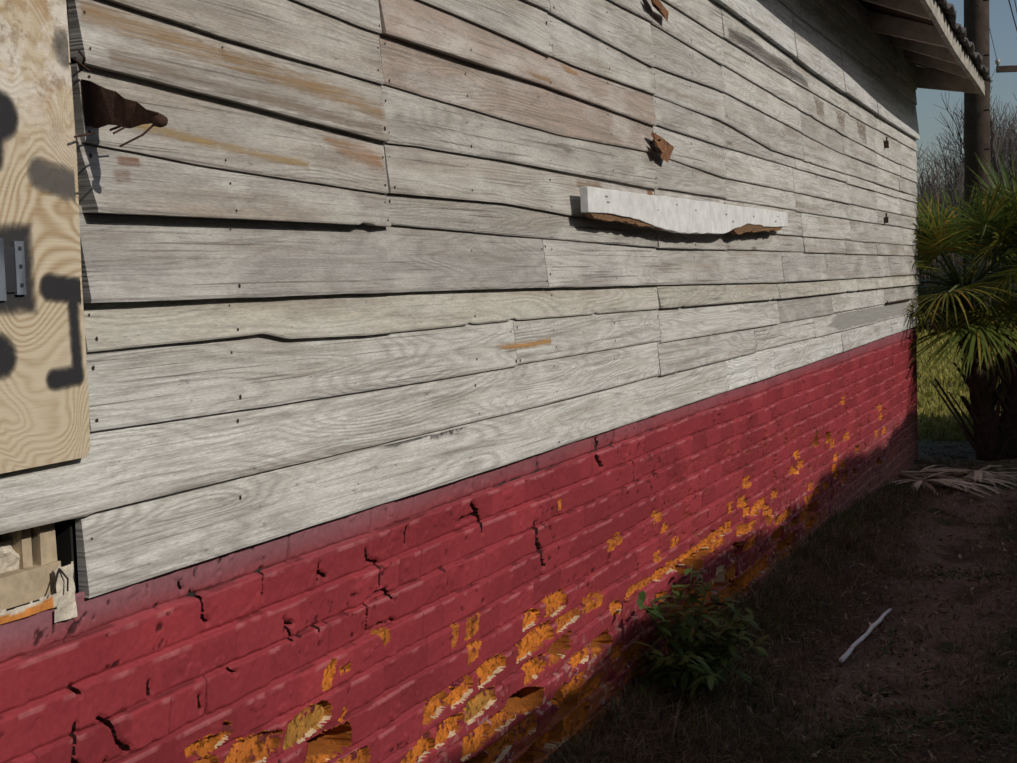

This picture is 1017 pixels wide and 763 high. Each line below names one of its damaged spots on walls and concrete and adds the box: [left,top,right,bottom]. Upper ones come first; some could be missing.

crack [457,501,483,533]
flaking render [0,539,20,574]
crack [532,520,546,568]
flaking render [0,561,77,624]
crack [177,581,208,622]
crack [363,548,393,628]
spalling [401,431,859,763]
crack [283,621,320,641]
crack [67,685,81,695]
spalling [184,657,351,763]
crack [69,715,131,763]
spalling [336,746,370,763]